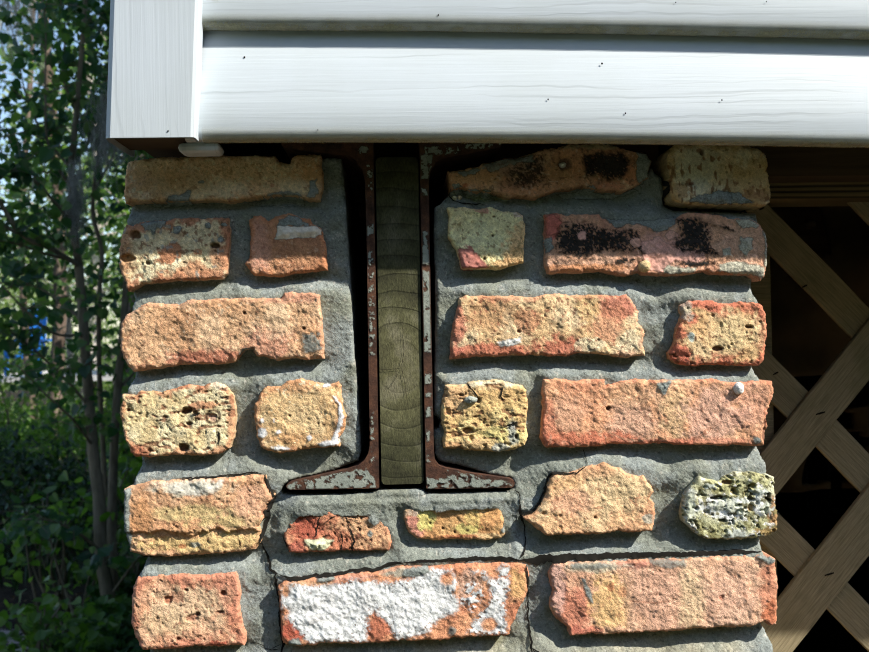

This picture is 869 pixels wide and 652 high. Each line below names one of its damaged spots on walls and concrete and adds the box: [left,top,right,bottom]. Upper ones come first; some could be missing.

crack [177,450,761,652]